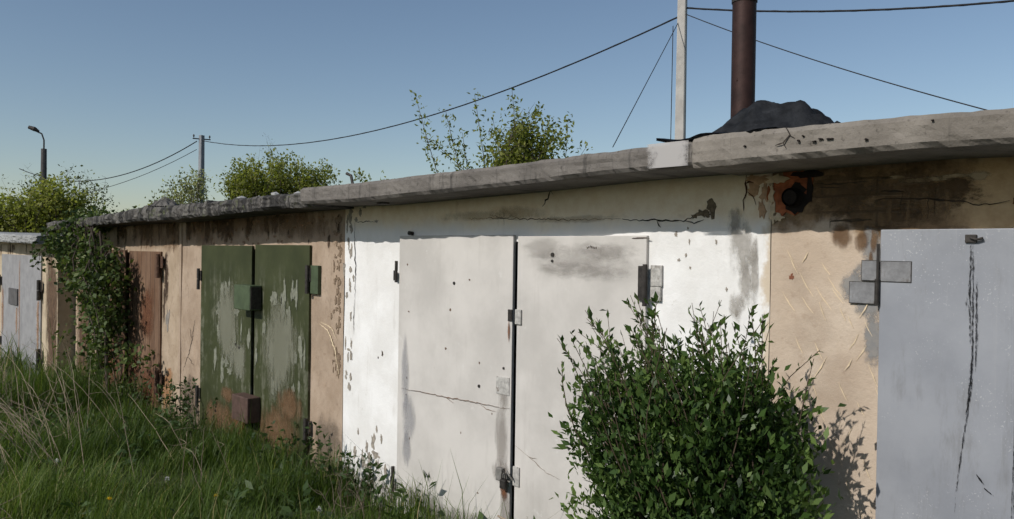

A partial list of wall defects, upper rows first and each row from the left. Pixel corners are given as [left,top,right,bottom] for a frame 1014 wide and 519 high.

crack [468,192,702,227]
spalling [746,170,824,224]
crack [829,185,1010,233]
water stain [731,212,758,315]
flaking render [190,206,366,395]
crack [402,388,510,411]